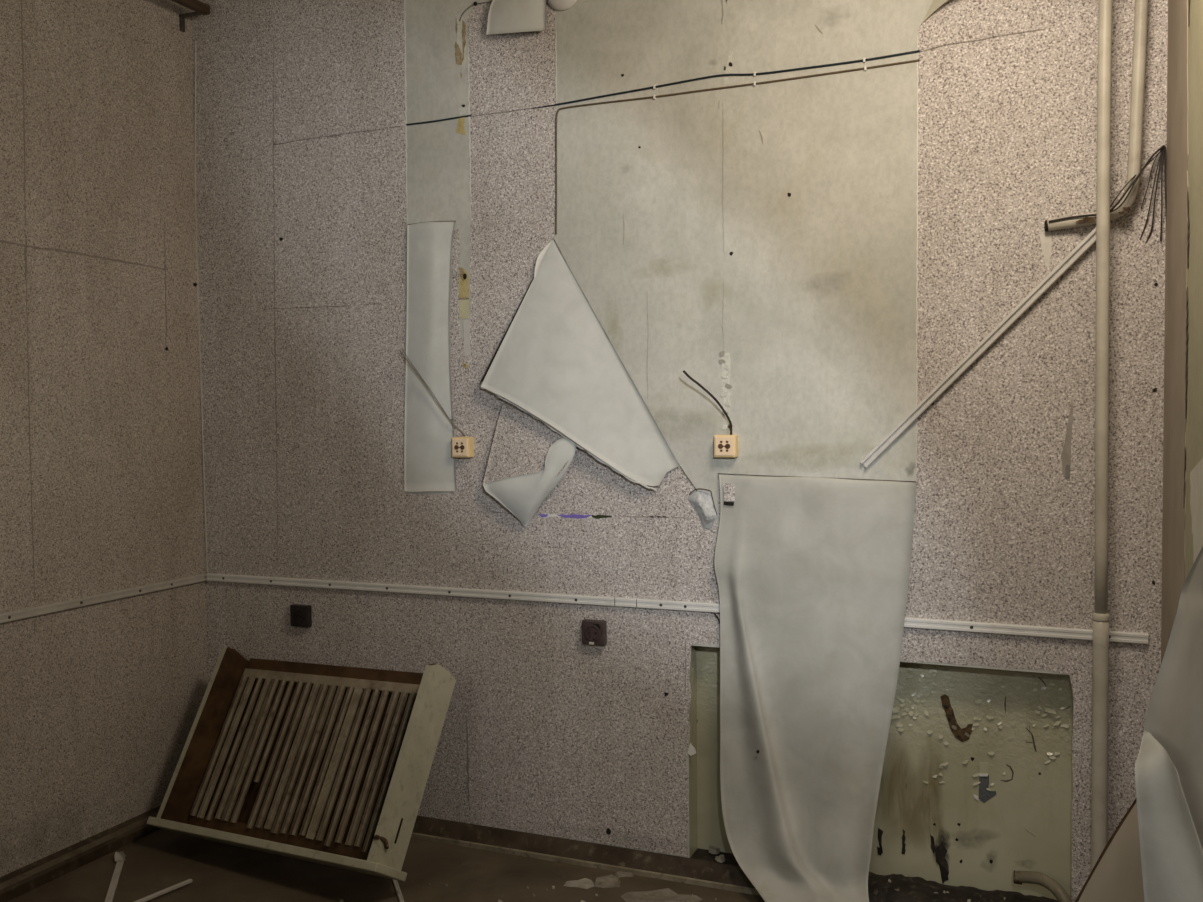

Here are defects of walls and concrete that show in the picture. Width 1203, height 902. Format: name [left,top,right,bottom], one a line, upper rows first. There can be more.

flaking render [404,0,948,527]
peeling [1061,404,1074,479]
peeling [1190,458,1203,564]
rust [940,694,973,742]
leakage [930,835,949,883]